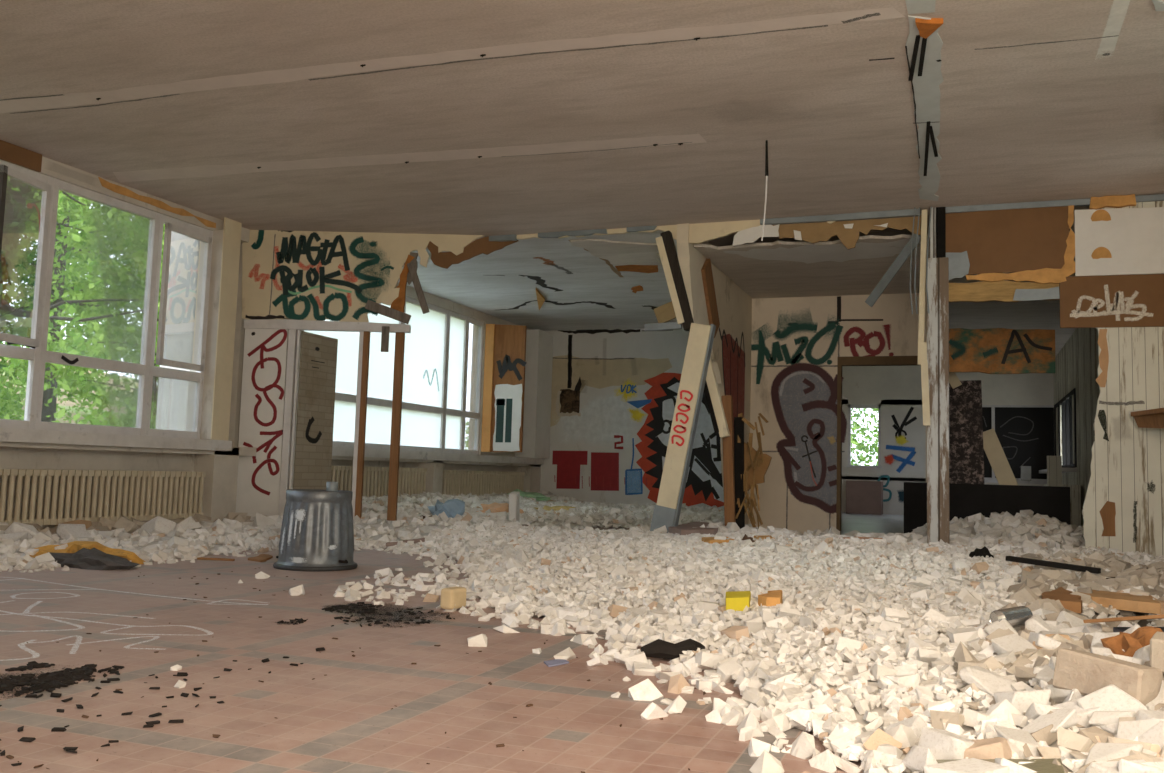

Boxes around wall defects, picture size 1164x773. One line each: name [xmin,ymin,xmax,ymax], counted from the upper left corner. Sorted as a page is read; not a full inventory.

peeling [905,0,943,201]
peeling [569,239,662,293]
peeling [723,224,921,264]
peeling [1096,329,1145,441]
peeling [1099,501,1116,536]